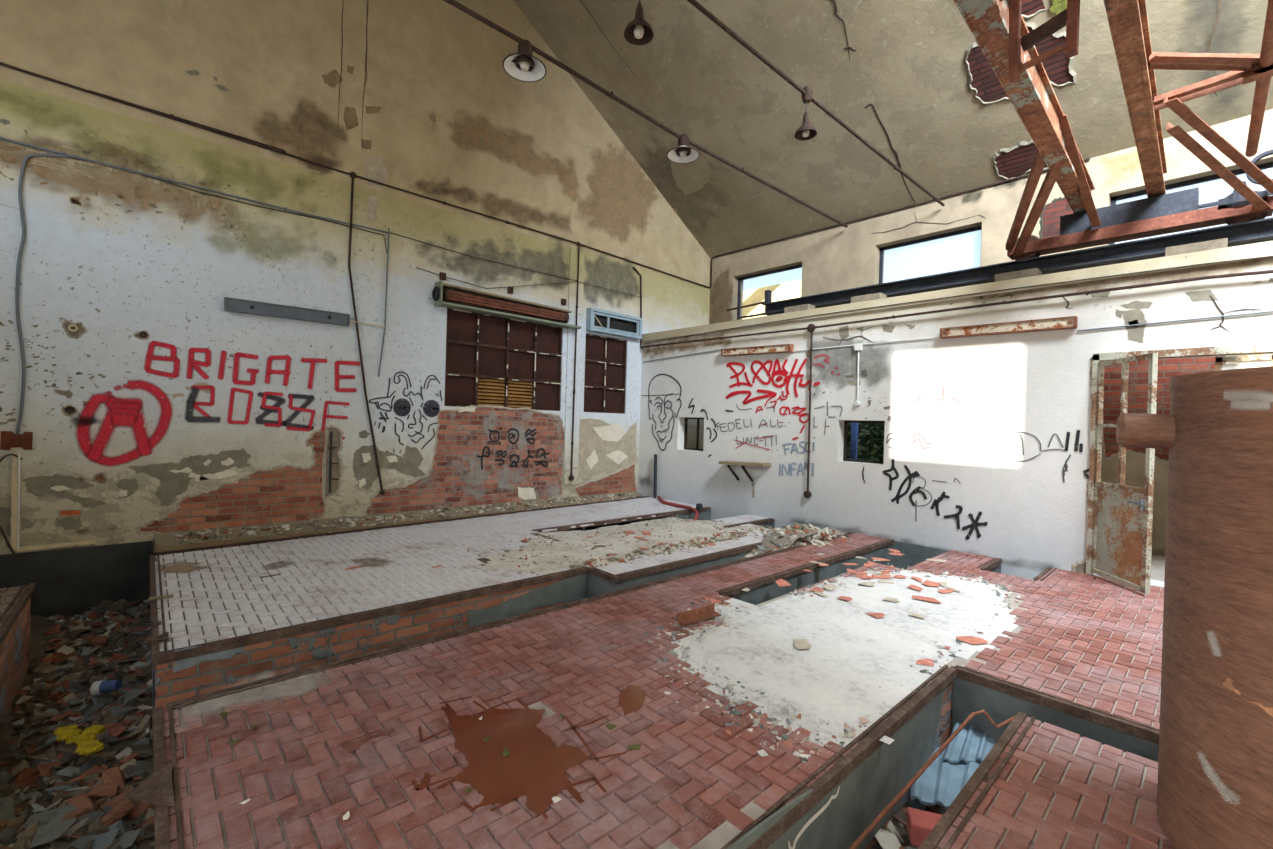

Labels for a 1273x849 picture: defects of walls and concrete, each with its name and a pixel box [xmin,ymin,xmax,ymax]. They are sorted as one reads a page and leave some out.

crack [338,0,368,124]
crack [830,0,857,59]
spalling [964,42,1011,106]
spalling [1021,0,1077,88]
leakage [0,140,234,220]
leakage [454,117,655,240]
leakage [419,183,568,288]
spalling [21,405,637,535]